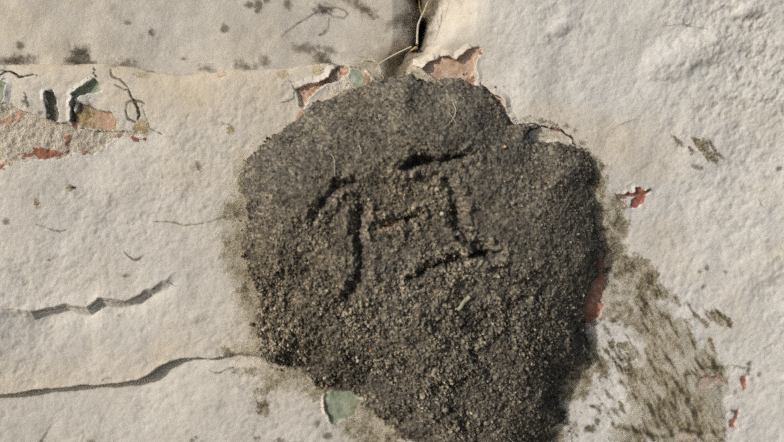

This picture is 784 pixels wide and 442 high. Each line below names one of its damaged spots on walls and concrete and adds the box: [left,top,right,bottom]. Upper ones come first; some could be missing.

crack [415,27,424,49]
peeling [0,68,148,169]
peeling [295,64,372,120]
peeling [412,43,518,125]
peeling [617,183,652,208]
peeling [583,258,605,332]
leakage [549,148,745,442]